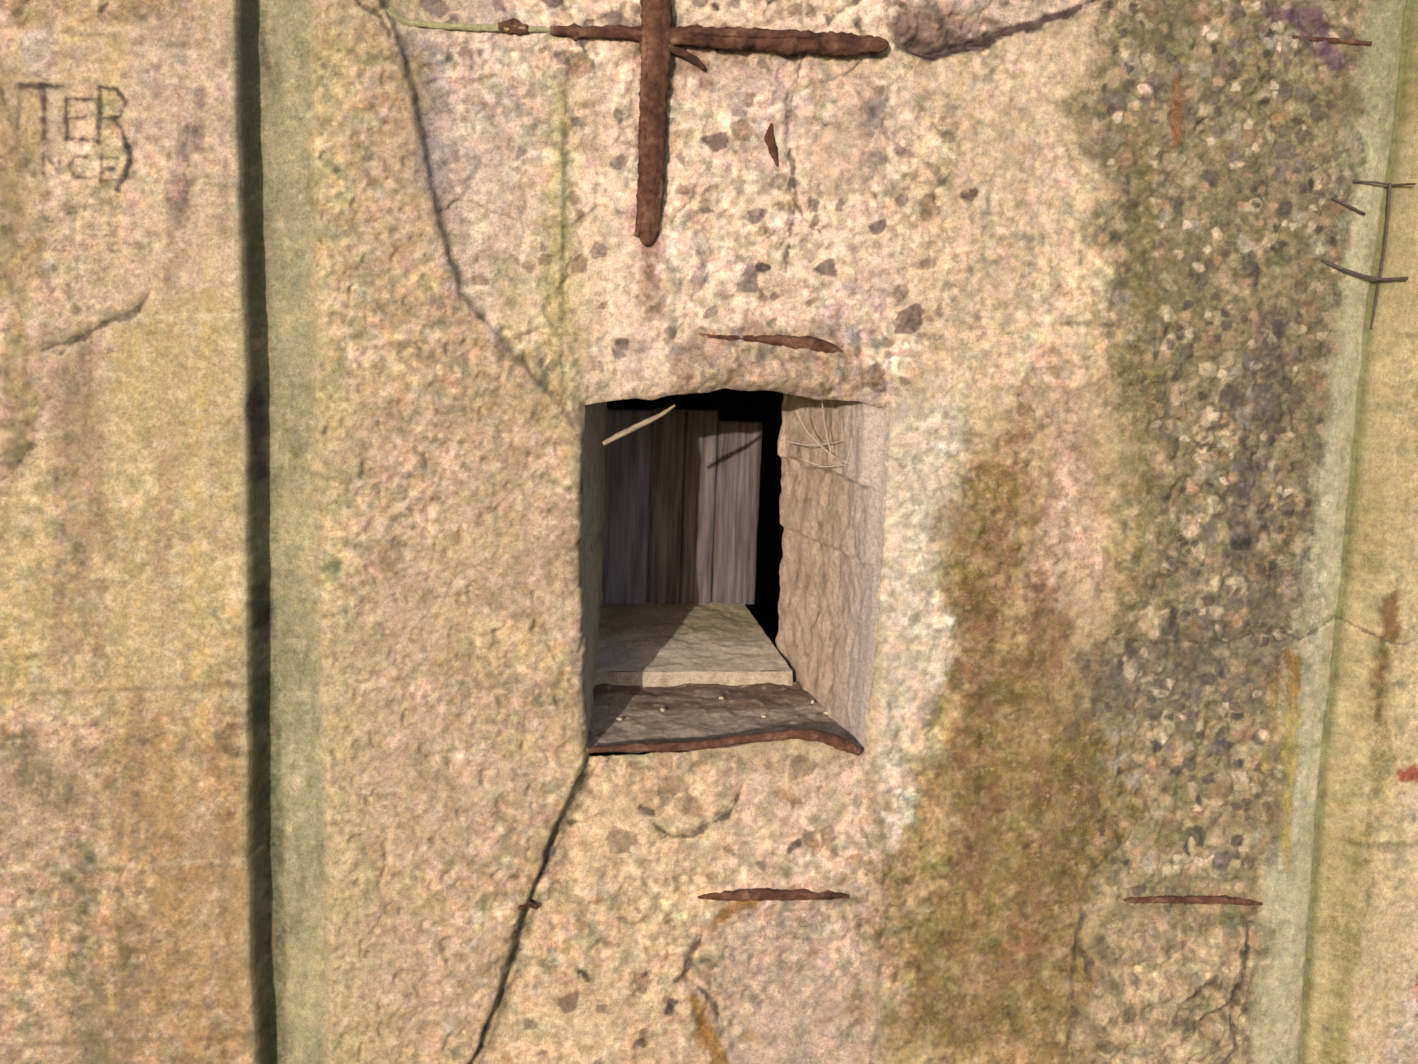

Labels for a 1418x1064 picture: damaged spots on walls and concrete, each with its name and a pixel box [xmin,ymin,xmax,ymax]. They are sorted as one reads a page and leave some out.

rust [387,0,889,315]
crack [784,117,802,268]
crack [43,303,142,354]
rust [698,333,843,353]
leakage [246,384,267,481]
leakage [885,399,964,691]
leakage [255,586,272,639]
leakage [878,725,916,850]
crack [475,775,584,1056]
rust [698,888,849,932]
rust [1124,895,1263,906]
crack [1188,921,1251,1064]